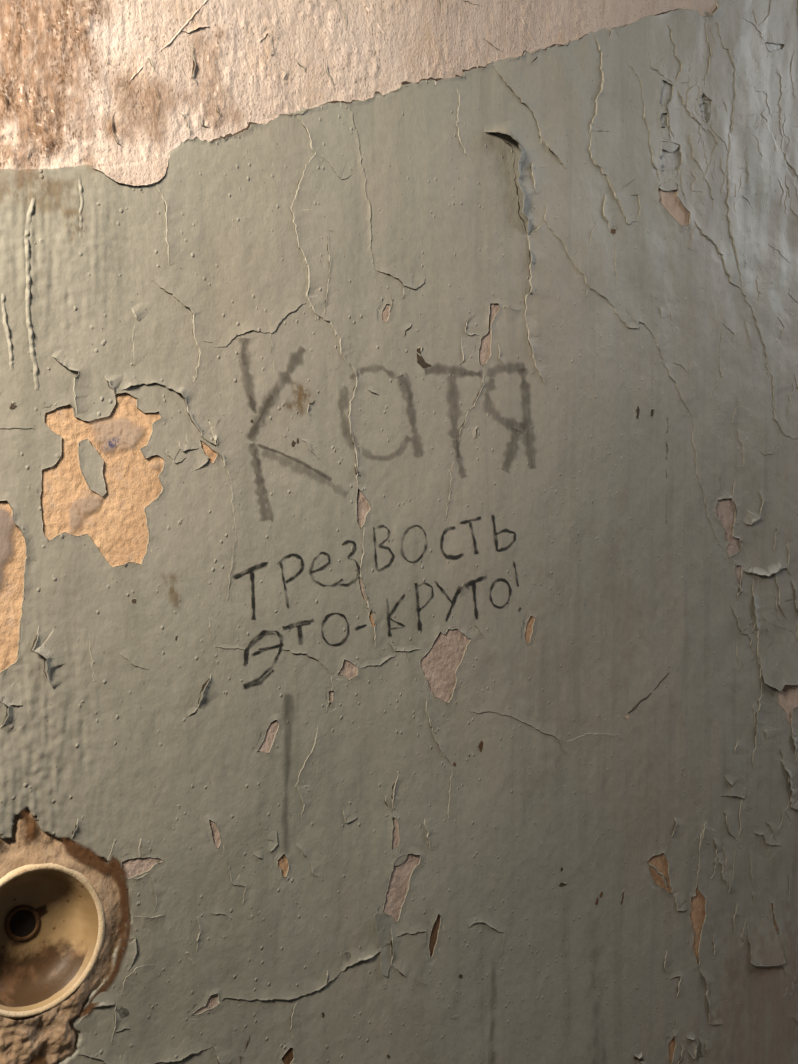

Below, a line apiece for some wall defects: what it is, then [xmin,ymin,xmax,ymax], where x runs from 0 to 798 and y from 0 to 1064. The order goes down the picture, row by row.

flaking render [110,112,126,149]
peeling [589,0,798,252]
crack [119,0,798,650]
crack [0,414,35,429]
peeling [0,350,223,732]
peeling [707,489,798,592]
crack [72,818,86,840]
crack [74,838,241,1064]
crack [196,527,421,952]
crack [214,920,427,1064]
peeling [375,810,427,976]
peeling [758,626,798,811]